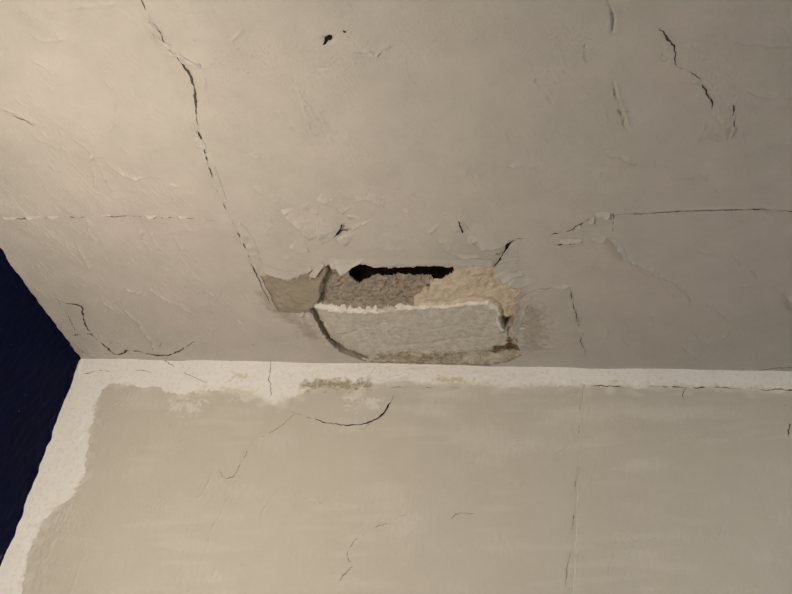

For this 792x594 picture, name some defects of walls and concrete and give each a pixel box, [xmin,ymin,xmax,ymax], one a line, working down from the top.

crack [141,0,227,209]
crack [3,213,207,221]
crack [55,298,207,383]
flaking render [260,242,537,376]
crack [263,386,399,437]